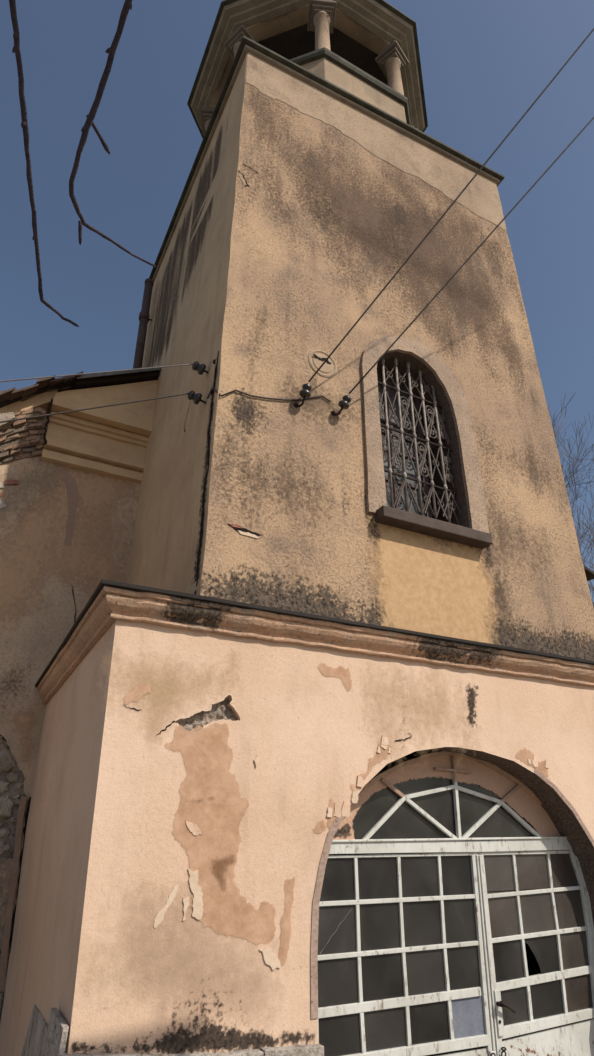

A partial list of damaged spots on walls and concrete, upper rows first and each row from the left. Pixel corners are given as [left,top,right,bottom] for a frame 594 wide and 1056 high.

damp [248,90,530,385]
spalling [228,523,261,539]
damp [493,582,513,631]
peeling [318,663,351,690]
damp [466,685,479,724]
flaking render [0,735,27,859]
peeling [313,735,391,833]
peeling [516,748,549,777]
peeling [157,693,295,970]
damp [150,992,226,1039]